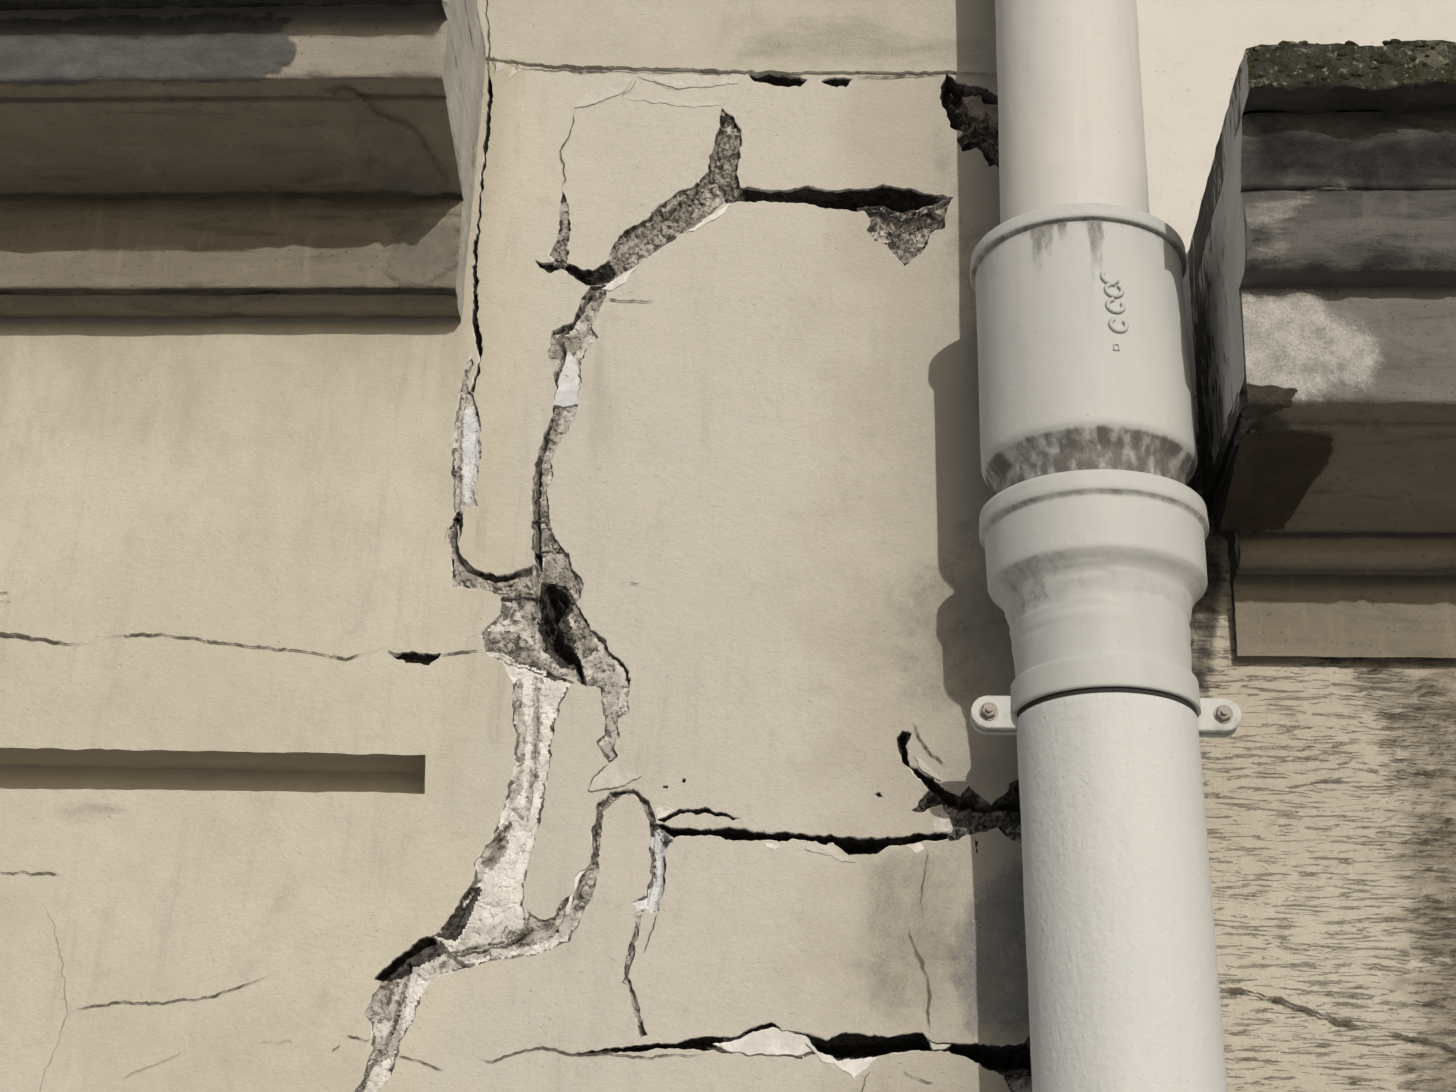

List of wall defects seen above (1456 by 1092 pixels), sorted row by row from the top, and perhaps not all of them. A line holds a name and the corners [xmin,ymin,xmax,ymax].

crack [114,0,1032,1092]
crack [0,632,78,645]
peeling [656,780,686,820]
peeling [905,842,924,853]
water stain [1318,657,1456,1091]